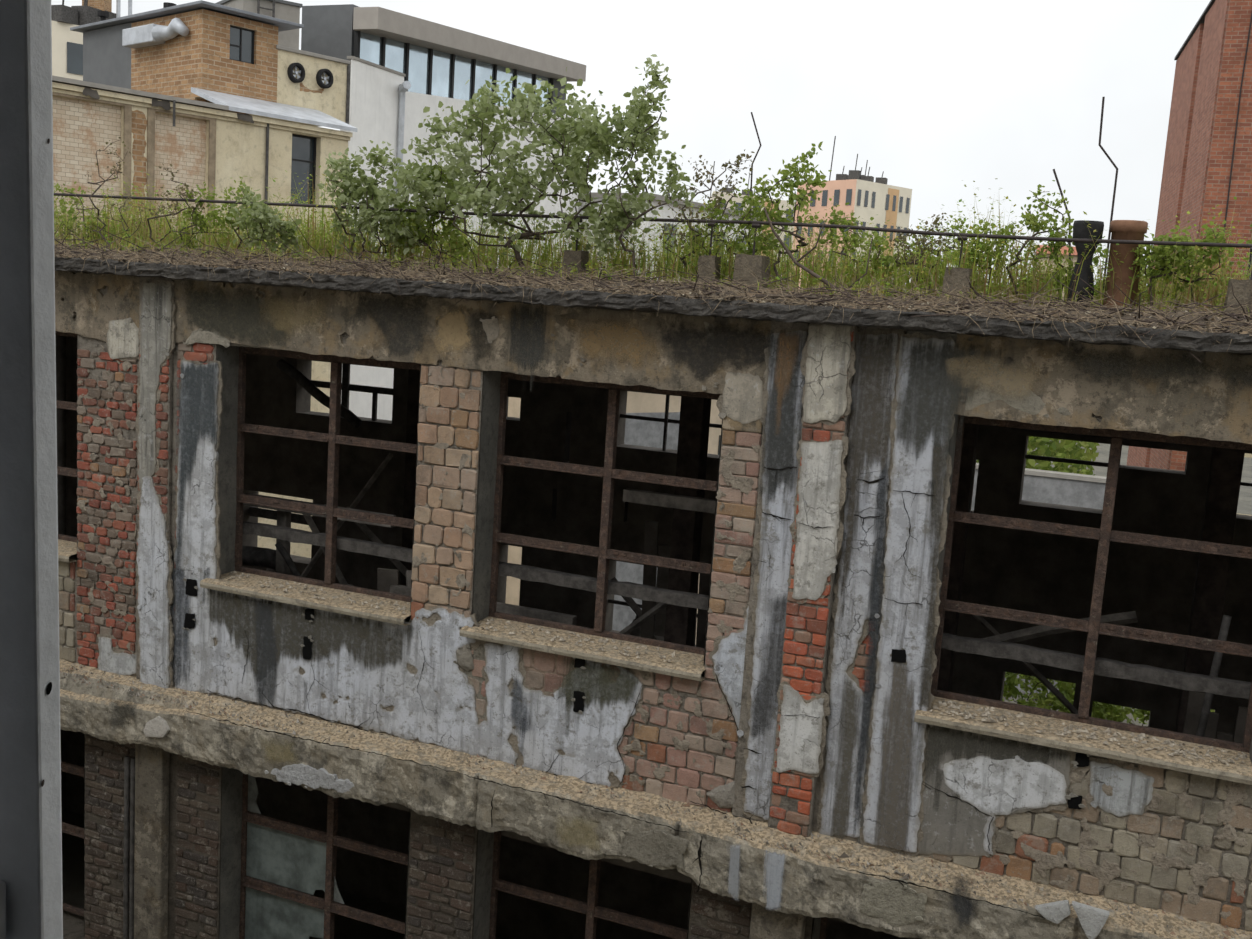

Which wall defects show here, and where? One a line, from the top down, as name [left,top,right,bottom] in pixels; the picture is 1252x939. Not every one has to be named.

damp [185,286,287,344]
damp [359,295,425,356]
damp [472,306,546,367]
damp [172,363,217,684]
damp [209,589,412,706]
flaking render [97,280,645,788]
crack [764,466,797,482]
crack [762,503,827,528]
crack [854,478,935,639]
flaking render [702,323,1156,859]
damp [831,334,1062,851]
peeling [1035,900,1110,939]